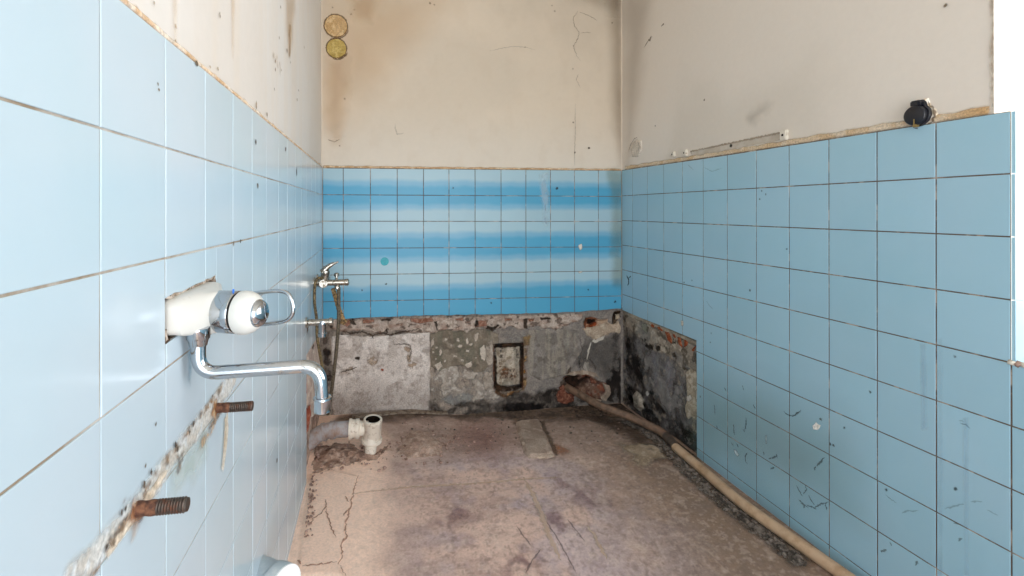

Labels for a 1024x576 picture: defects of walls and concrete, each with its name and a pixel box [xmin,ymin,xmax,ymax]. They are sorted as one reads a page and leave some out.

peeling [410,318,499,390]
spalling [526,317,611,404]
water stain [577,332,697,451]
spalling [625,311,697,371]
crack [297,477,358,575]